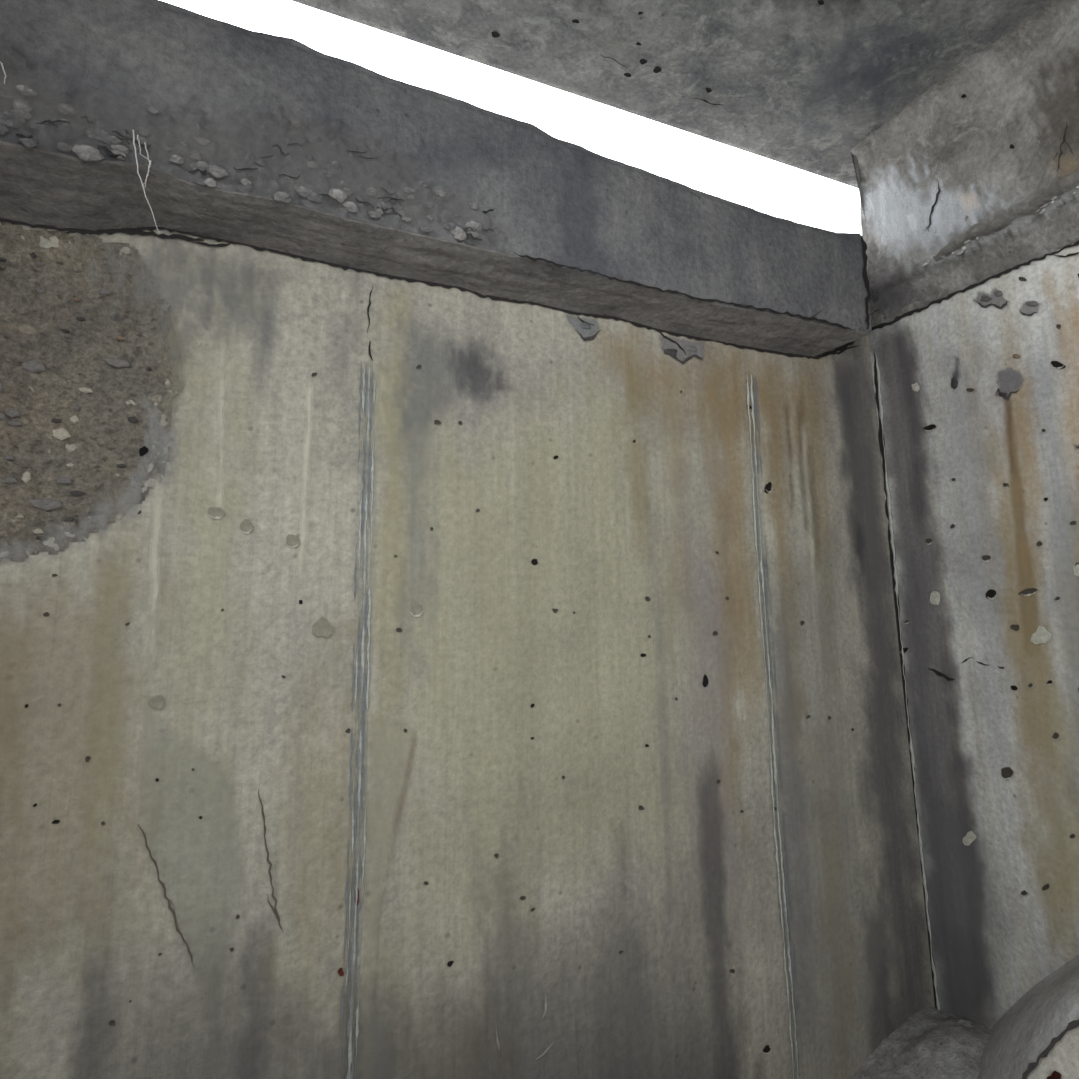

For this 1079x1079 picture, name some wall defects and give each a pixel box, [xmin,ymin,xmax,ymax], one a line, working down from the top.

crack [1054,122,1074,172]
crack [924,172,941,232]
spalling [0,222,182,562]
crack [0,218,1079,361]
spalling [567,316,601,341]
spalling [661,337,704,365]
spalling [973,289,1008,309]
spalling [996,354,1023,400]
spalling [1020,301,1039,316]
rust [1008,408,1034,647]
crack [258,789,283,931]
crack [138,825,195,968]